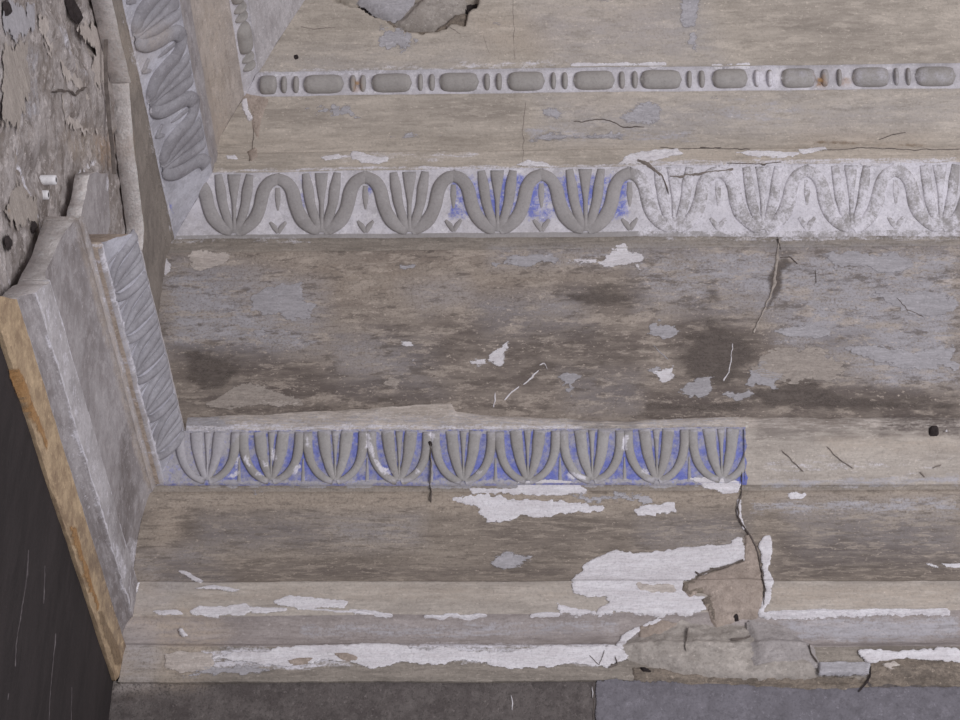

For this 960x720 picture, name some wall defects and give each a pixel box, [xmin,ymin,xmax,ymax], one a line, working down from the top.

spalling [356,0,478,53]
peeling [1,0,104,137]
crack [814,132,959,151]
crack [637,147,780,194]
peeling [491,243,644,270]
crack [753,237,816,333]
water stain [189,353,236,386]
water stain [685,321,751,383]
water stain [757,383,895,407]
peeling [452,479,677,523]
crack [736,475,774,615]
peeling [153,534,960,692]